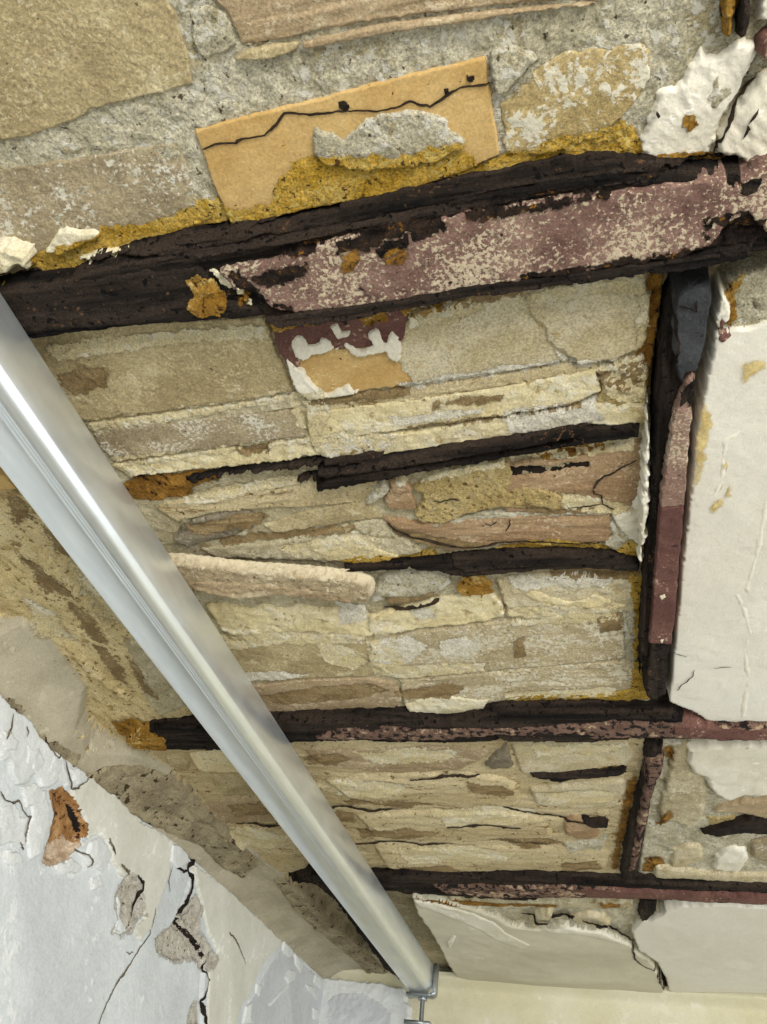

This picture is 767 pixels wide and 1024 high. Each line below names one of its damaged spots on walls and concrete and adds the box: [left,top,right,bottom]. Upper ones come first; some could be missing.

crack [202,75,490,150]
spalling [0,0,767,276]
corrosion [0,119,725,334]
spalling [29,273,666,714]
corrosion [124,422,640,501]
corrosion [111,718,167,751]
crack [99,858,210,1024]
spalling [0,467,311,885]
flaking render [0,695,324,1024]
spalling [290,738,645,873]
crack [632,941,665,989]
spalling [637,738,767,882]